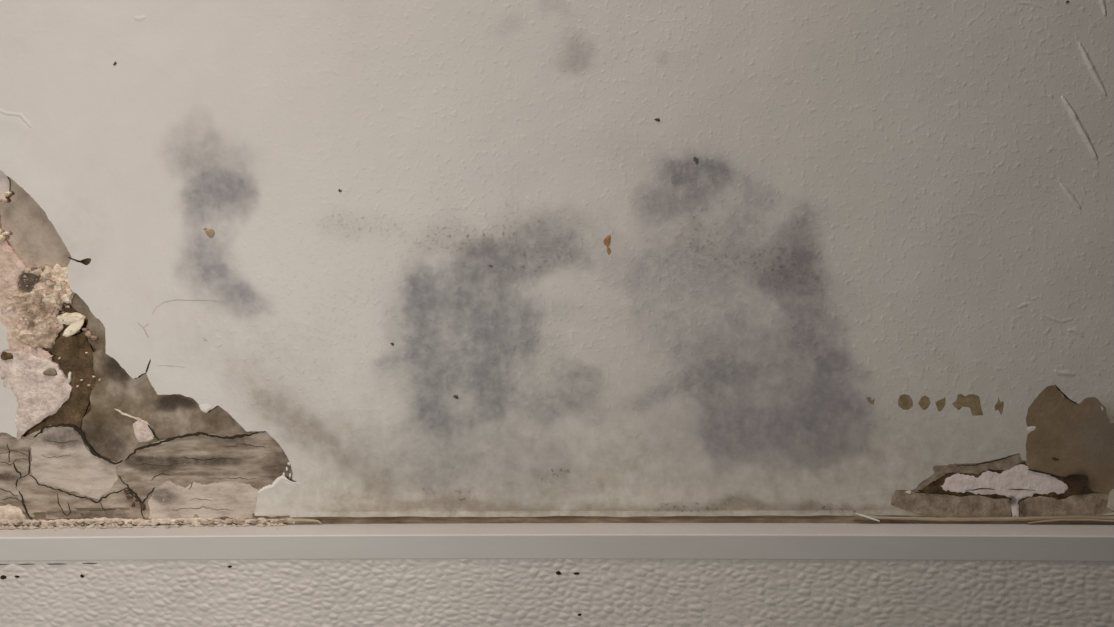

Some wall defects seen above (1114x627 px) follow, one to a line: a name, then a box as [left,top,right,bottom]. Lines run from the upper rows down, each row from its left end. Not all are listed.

spalling [0,171,311,526]
peeling [891,385,1114,518]